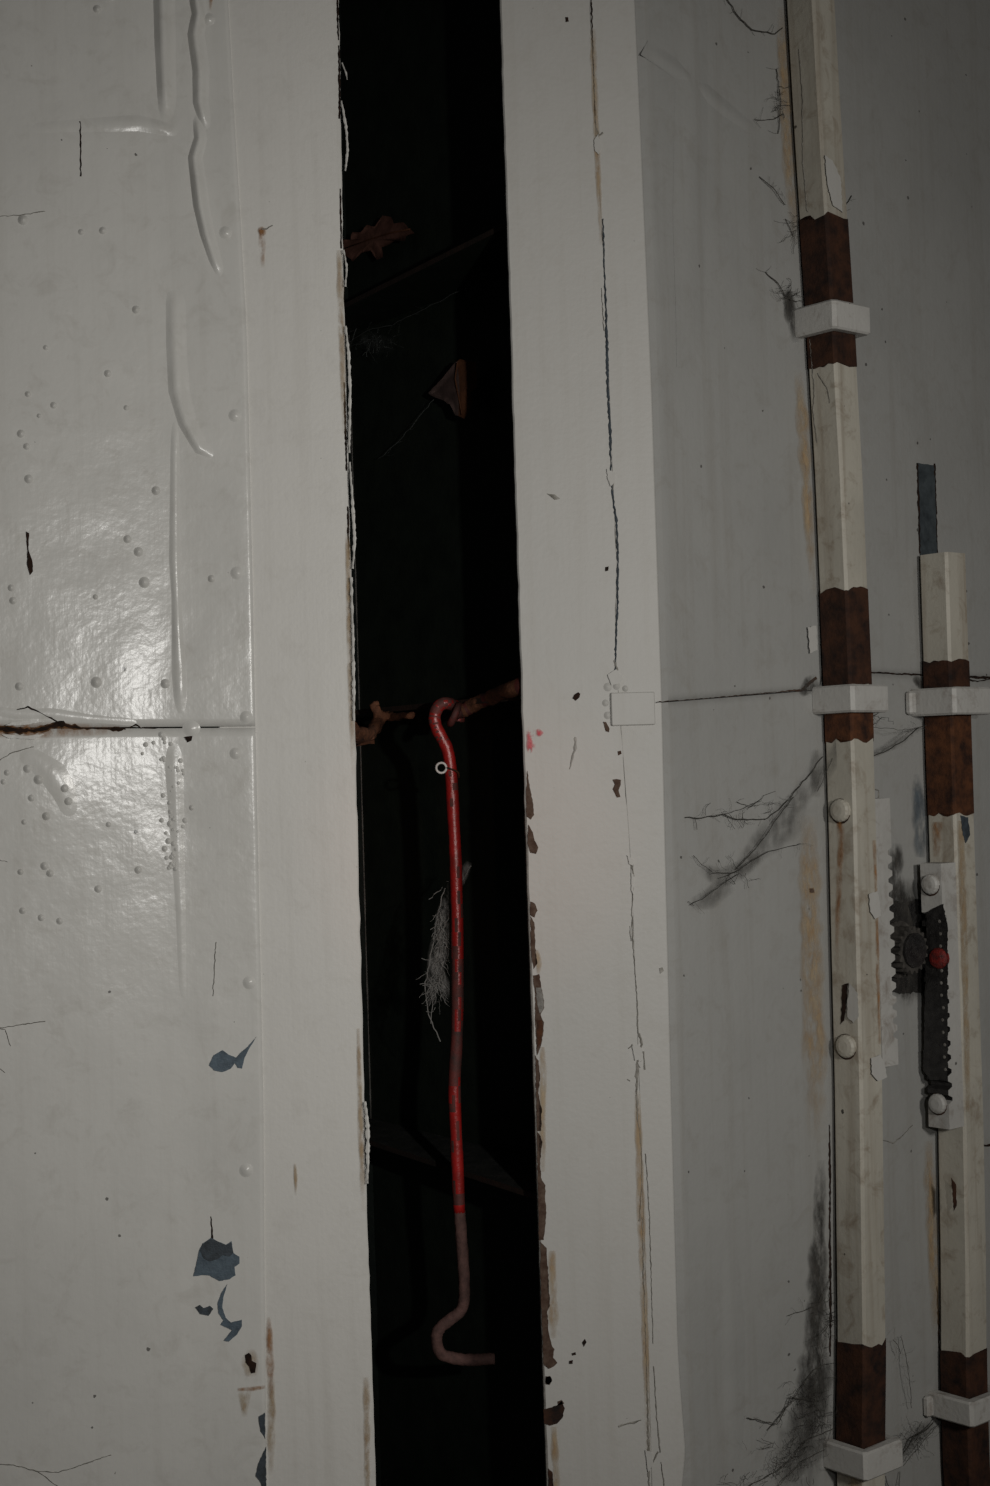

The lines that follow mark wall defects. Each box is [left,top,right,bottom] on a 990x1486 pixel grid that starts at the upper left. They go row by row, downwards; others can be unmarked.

crack [590,0,603,155]
crack [601,219,623,685]
crack [0,706,170,760]
peeling [526,771,538,854]
peeling [209,1039,255,1072]
peeling [530,902,586,1385]
crack [627,855,665,1486]
peeling [193,1216,242,1342]
peeling [256,1413,267,1486]
peeling [543,1400,565,1426]